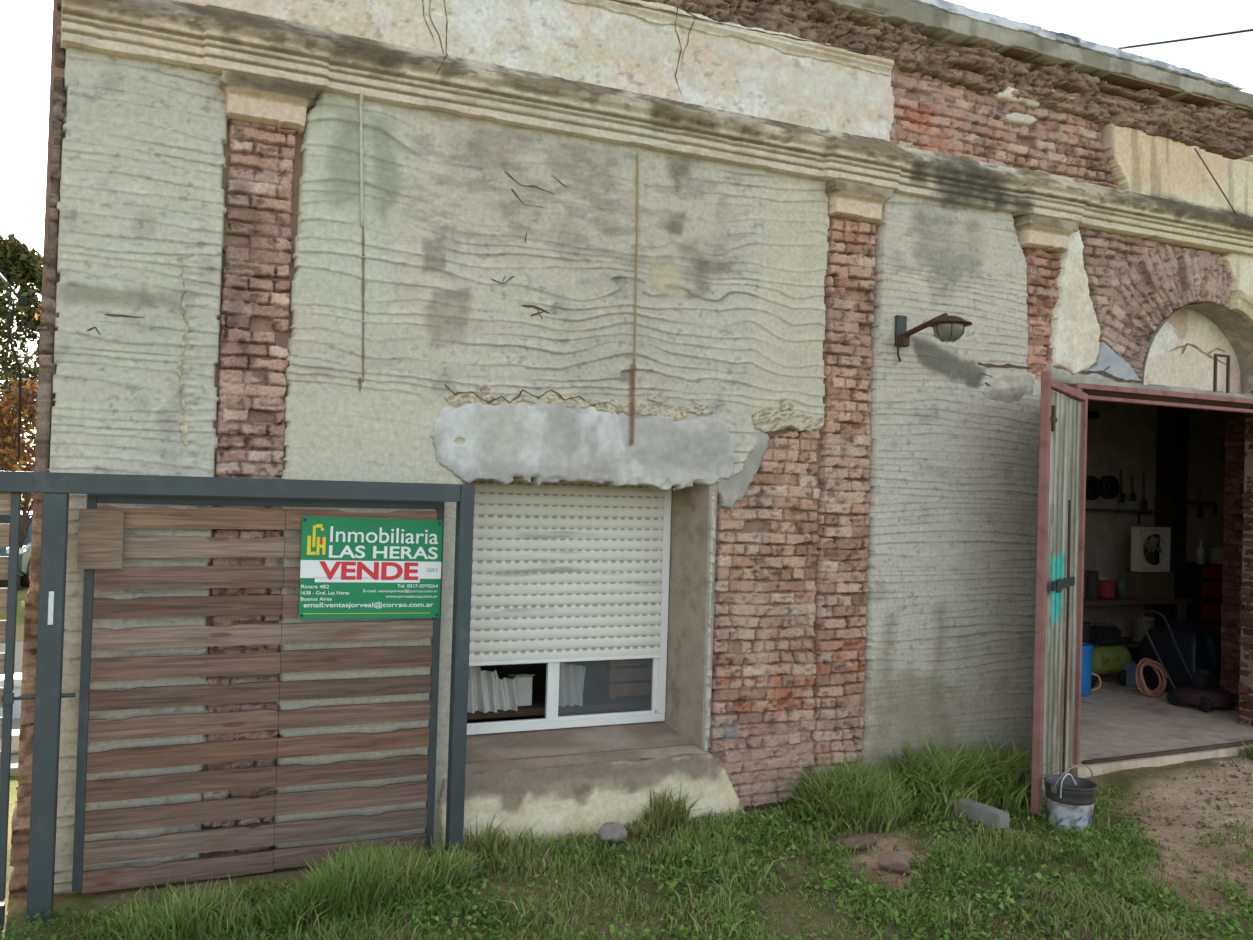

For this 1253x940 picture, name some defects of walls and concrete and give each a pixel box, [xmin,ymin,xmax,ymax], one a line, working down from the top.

crack [422,0,448,75]
crack [613,0,893,95]
flaking render [641,0,1253,189]
crack [505,171,568,242]
flaking render [215,119,296,479]
crack [491,275,551,319]
flaking render [1024,227,1232,383]
flaking render [213,529,282,539]
flaking render [708,217,876,808]
flaking render [209,645,279,654]
flaking render [200,845,274,859]
flaking render [202,816,273,830]